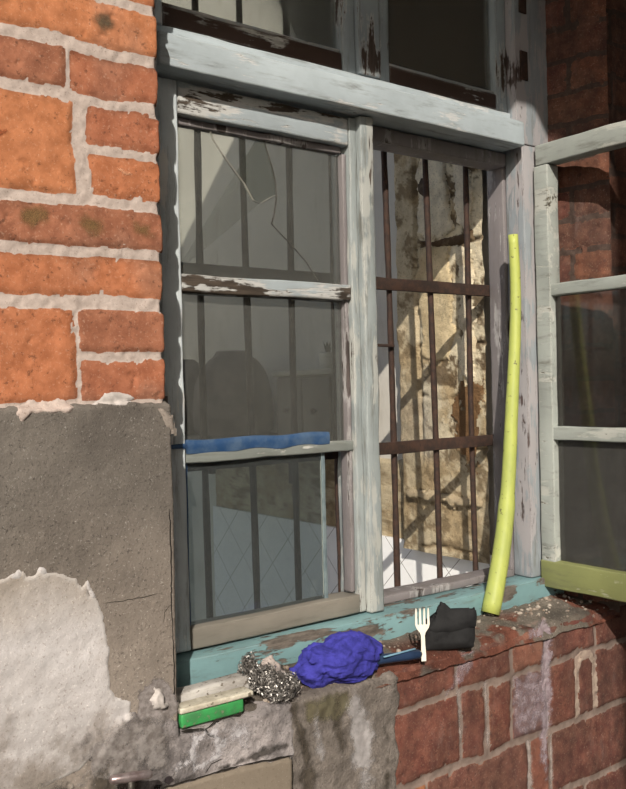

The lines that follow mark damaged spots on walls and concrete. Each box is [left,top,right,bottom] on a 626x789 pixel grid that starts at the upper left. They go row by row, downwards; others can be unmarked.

corrosion [451,378,485,437]
peeling [0,567,178,789]
damp [91,763,140,789]
damp [176,726,247,771]
damp [290,703,323,789]
damp [333,696,374,787]
damp [517,619,552,778]